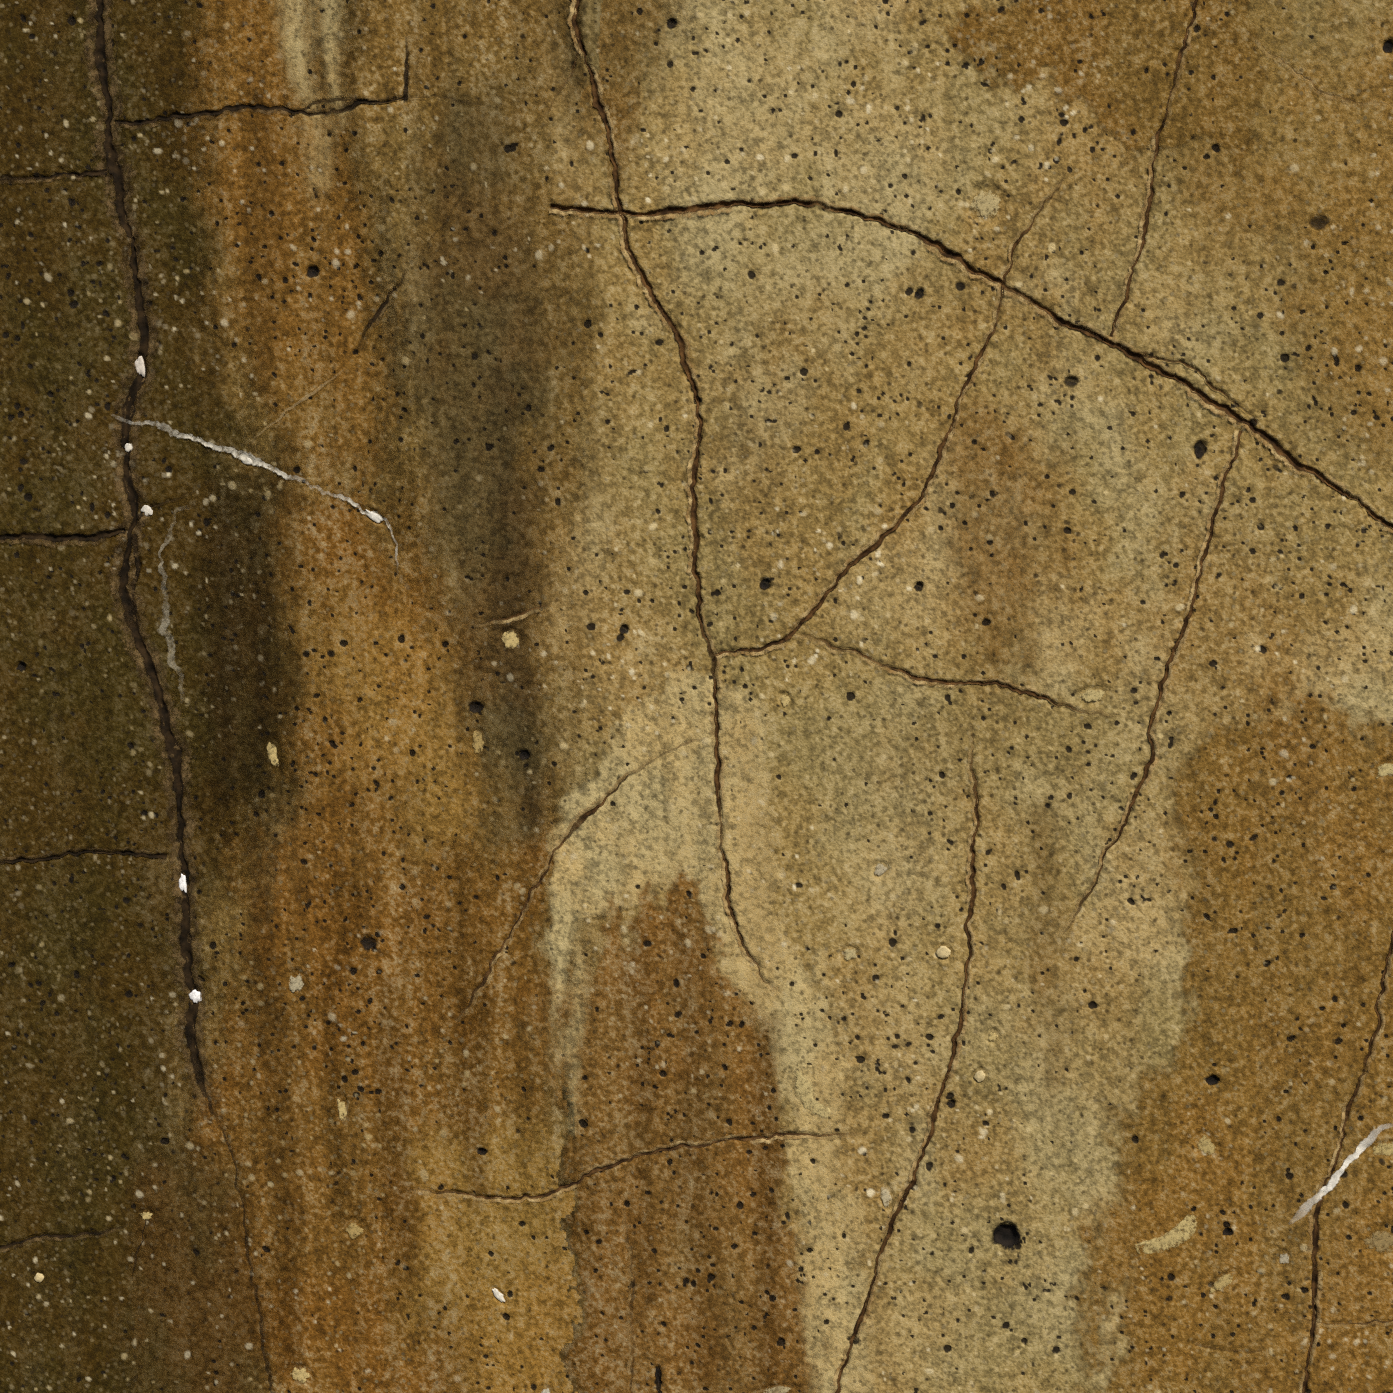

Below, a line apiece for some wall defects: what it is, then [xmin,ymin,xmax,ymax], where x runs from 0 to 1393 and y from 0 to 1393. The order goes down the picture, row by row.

crack [0,0,409,1393]
water stain [149,0,875,1393]
crack [489,607,536,624]
crack [470,771,638,1004]
crack [431,1132,838,1203]
crack [833,750,980,1393]
crack [549,0,1393,978]
crack [1299,931,1393,1393]